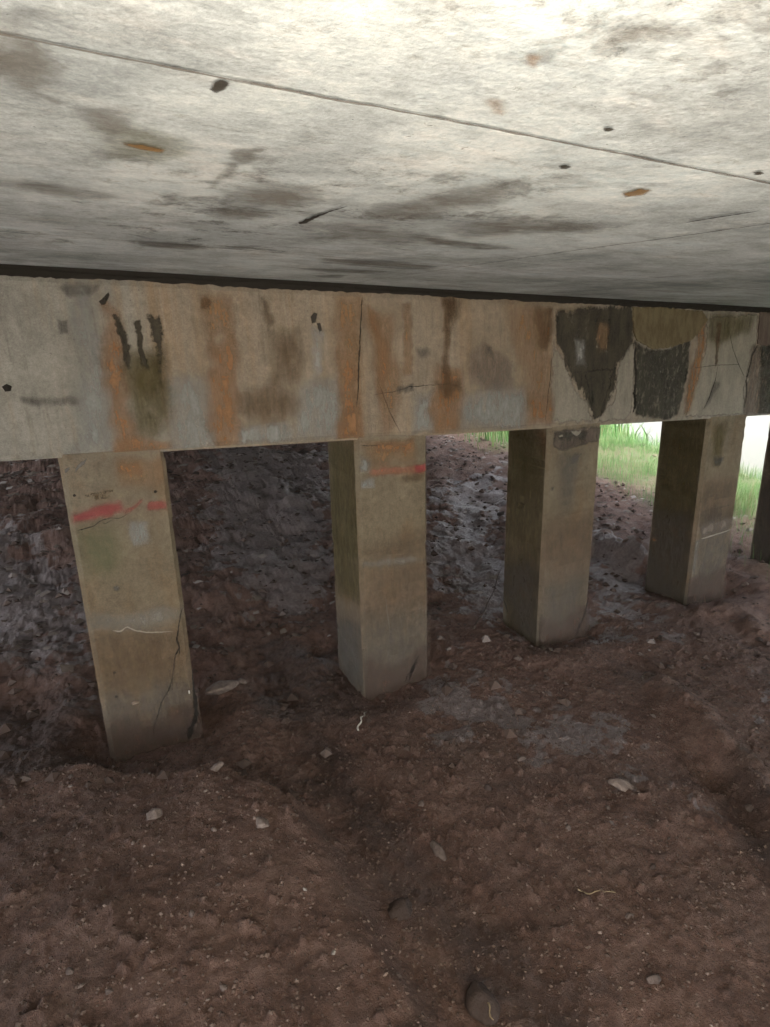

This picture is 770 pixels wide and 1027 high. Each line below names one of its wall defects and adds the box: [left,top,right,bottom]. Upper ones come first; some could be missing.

rust [126,143,162,153]
rust [624,189,650,197]
rust [99,293,168,452]
water stain [112,314,163,392]
water stain [555,305,633,419]
water stain [753,438,770,556]
crack [153,608,199,739]